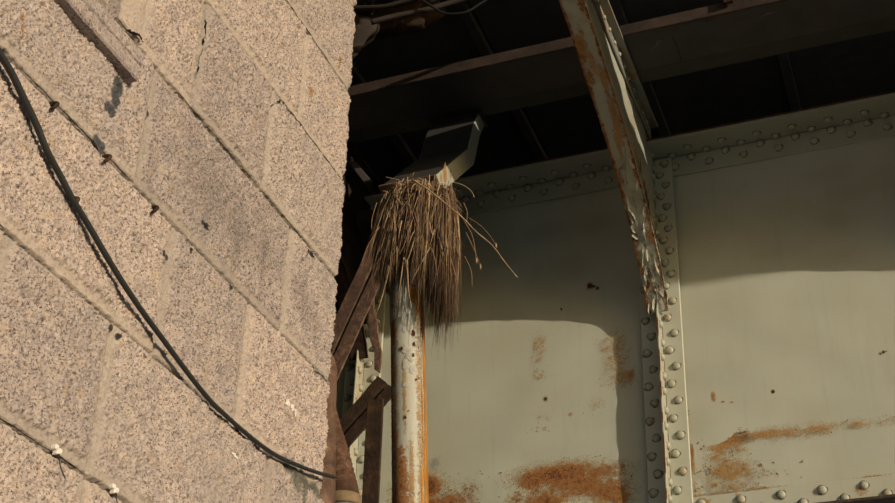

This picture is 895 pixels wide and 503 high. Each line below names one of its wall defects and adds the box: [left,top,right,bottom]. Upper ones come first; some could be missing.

rust [559,0,668,335]
peeling [620,147,667,314]
rust [387,275,483,503]
rust [498,455,635,503]
rust [690,415,894,503]